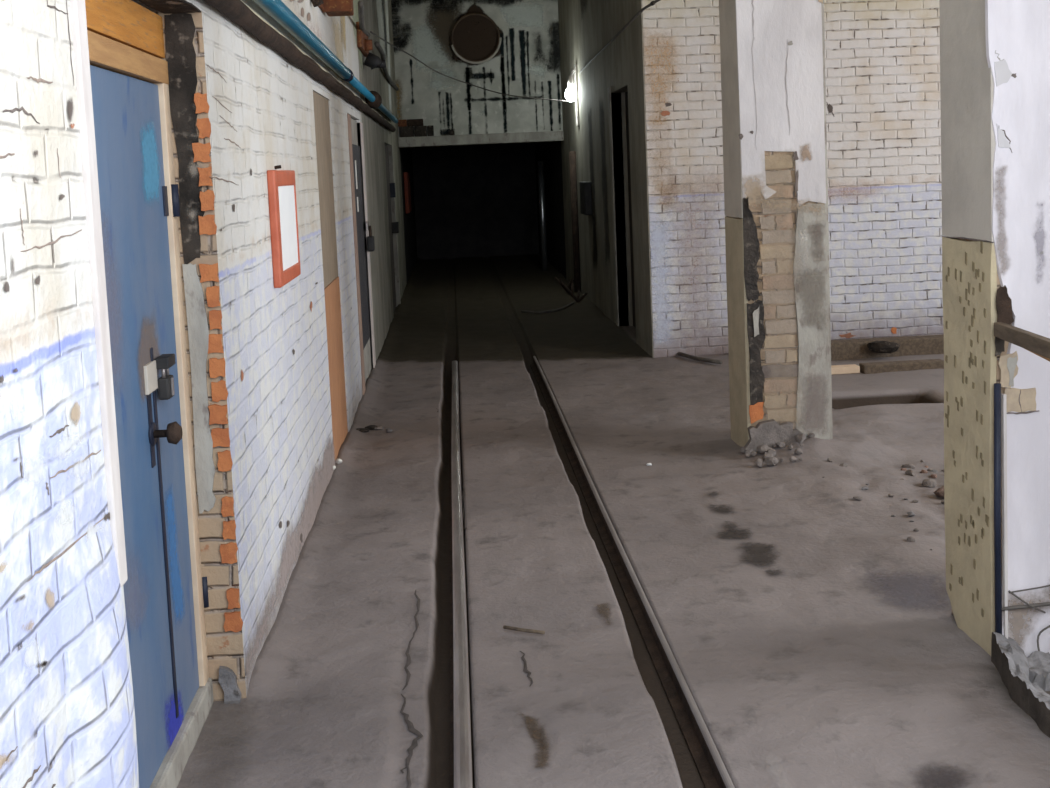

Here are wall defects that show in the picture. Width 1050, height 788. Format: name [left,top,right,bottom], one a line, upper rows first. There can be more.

damp [391,0,521,52]
damp [438,92,454,136]
damp [464,21,561,134]
spalling [192,92,237,235]
spalling [743,145,811,429]
spalling [996,285,1014,325]
spalling [199,263,233,472]
spalling [995,337,1039,414]
spalling [220,496,238,564]
spalling [223,588,243,632]
crack [400,590,423,788]
damp [918,766,965,788]